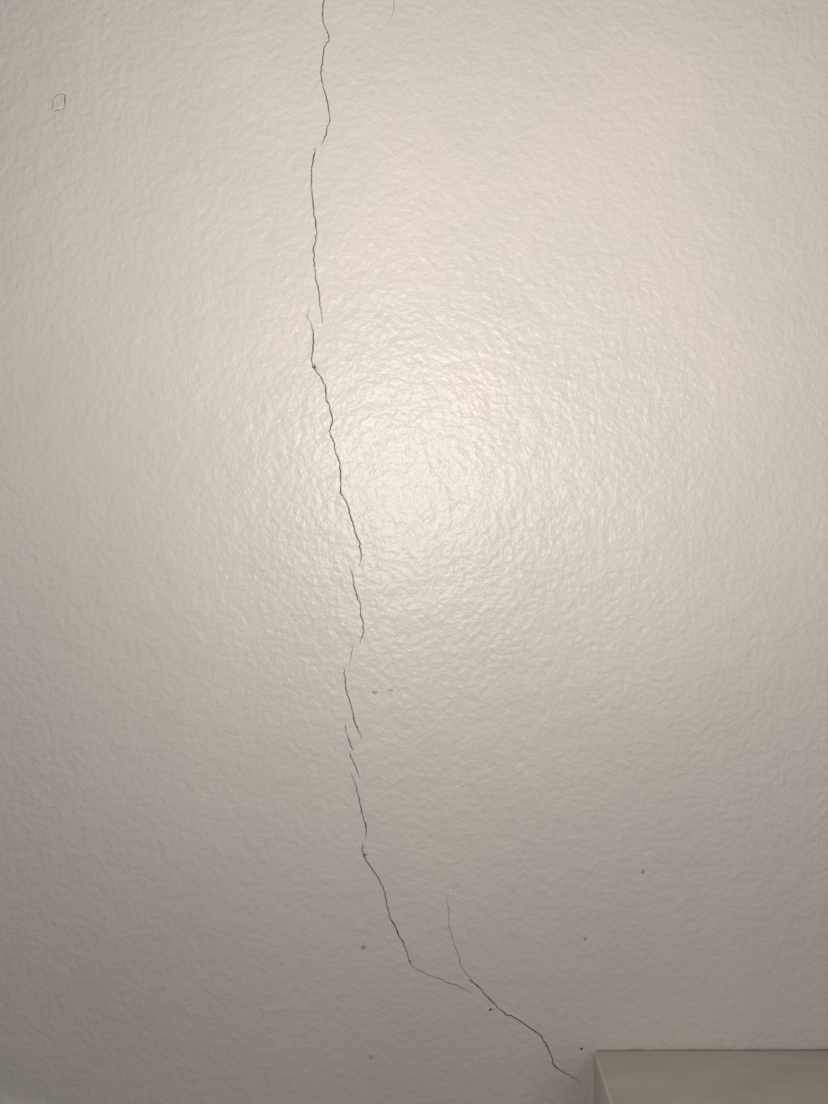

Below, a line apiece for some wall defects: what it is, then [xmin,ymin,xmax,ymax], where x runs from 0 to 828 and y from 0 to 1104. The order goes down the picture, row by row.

crack [307,0,584,1083]